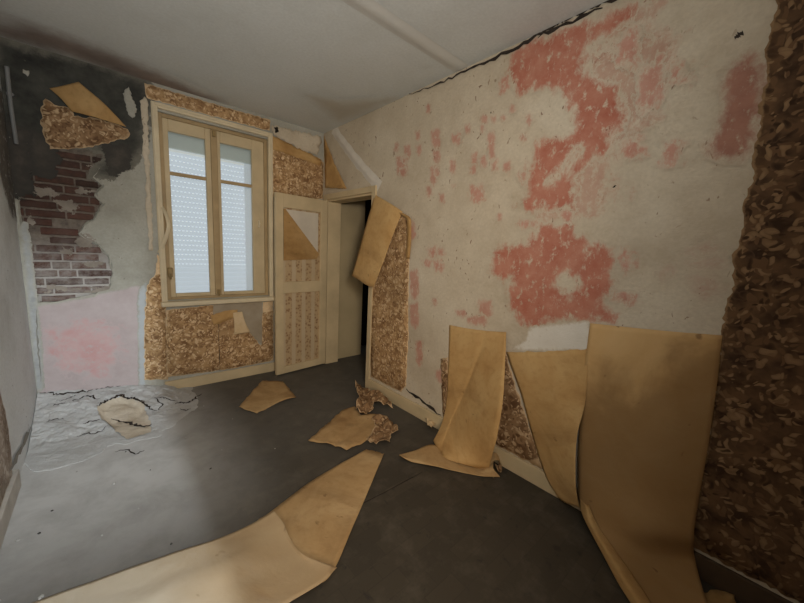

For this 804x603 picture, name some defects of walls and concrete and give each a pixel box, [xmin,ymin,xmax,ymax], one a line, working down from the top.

crack [409,0,617,94]
spalling [123,87,153,251]
peeling [271,125,346,189]
peeling [286,209,318,252]
spalling [18,148,114,391]
peeling [213,301,262,345]
crack [44,386,201,436]